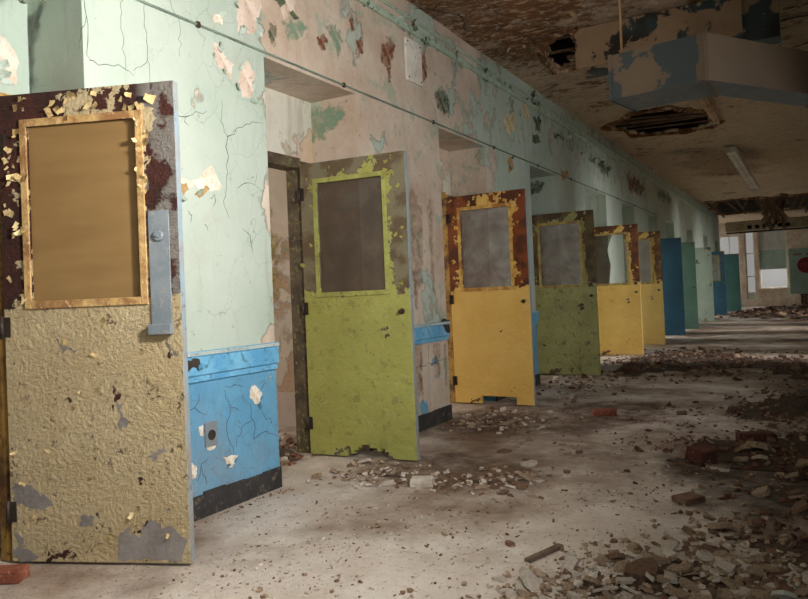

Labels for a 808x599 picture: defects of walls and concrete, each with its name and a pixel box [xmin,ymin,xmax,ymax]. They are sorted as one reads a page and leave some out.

crack [79,0,150,76]
peeling [213,0,263,38]
peeling [275,0,299,20]
peeling [0,36,19,85]
peeling [213,42,258,104]
crack [179,100,263,217]
flaking render [181,165,222,201]
peeling [188,358,204,371]
flaking render [250,385,263,408]
crack [225,383,272,453]
flaking render [223,455,238,468]